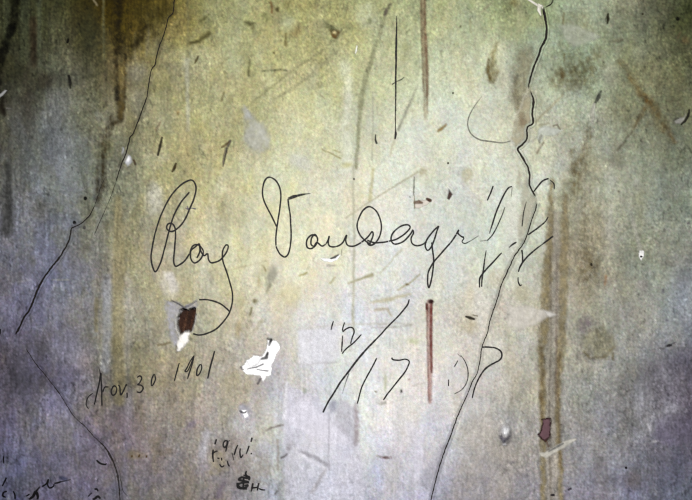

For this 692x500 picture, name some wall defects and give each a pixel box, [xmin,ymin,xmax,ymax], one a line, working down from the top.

crack [14,0,175,500]
spalling [166,301,196,351]
spalling [241,339,280,384]
crack [430,0,554,500]
spalling [538,418,551,442]
damp [538,180,568,500]